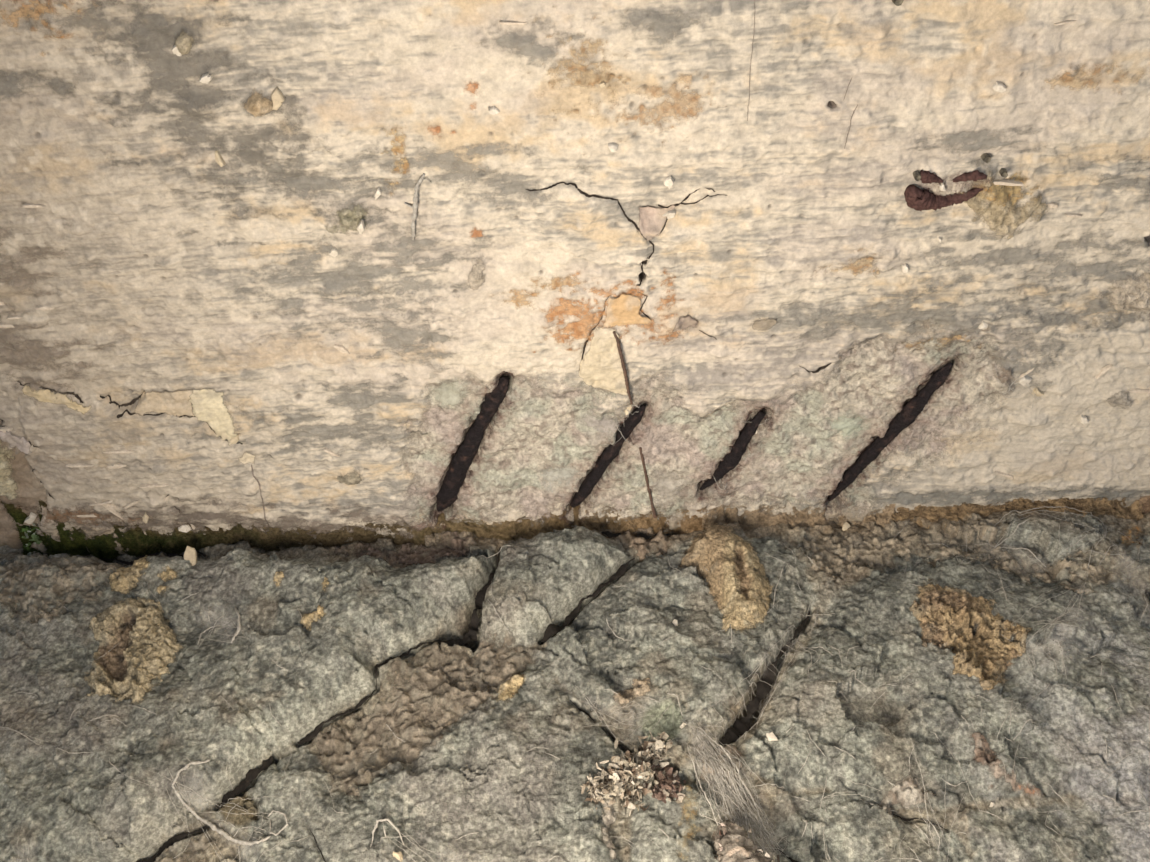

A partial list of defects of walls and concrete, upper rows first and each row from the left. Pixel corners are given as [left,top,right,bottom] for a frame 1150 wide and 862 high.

crack [525,182,728,320]
crack [579,295,611,370]
peeling [0,431,32,454]
spalling [402,294,1044,538]
crack [541,531,680,642]
crack [297,547,501,745]
crack [570,700,633,753]
crack [719,611,810,746]
crack [136,756,273,862]